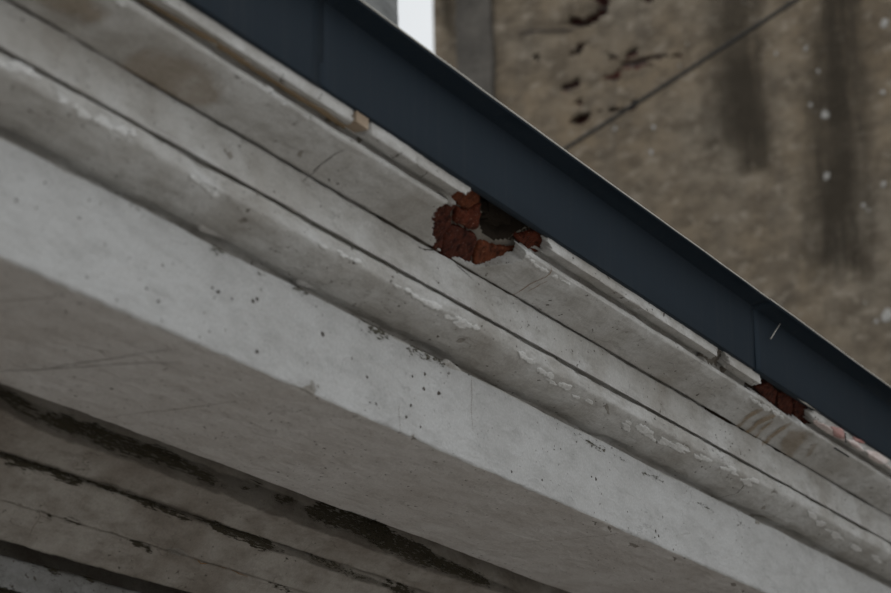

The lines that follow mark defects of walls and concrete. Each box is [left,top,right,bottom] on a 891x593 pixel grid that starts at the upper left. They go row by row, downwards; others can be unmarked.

spalling [570,0,610,28]
spalling [603,50,682,82]
damp [721,0,767,166]
damp [816,0,855,257]
spalling [379,190,571,298]
damp [0,387,215,485]
spalling [705,407,786,456]
spalling [744,377,891,469]
damp [0,451,289,560]